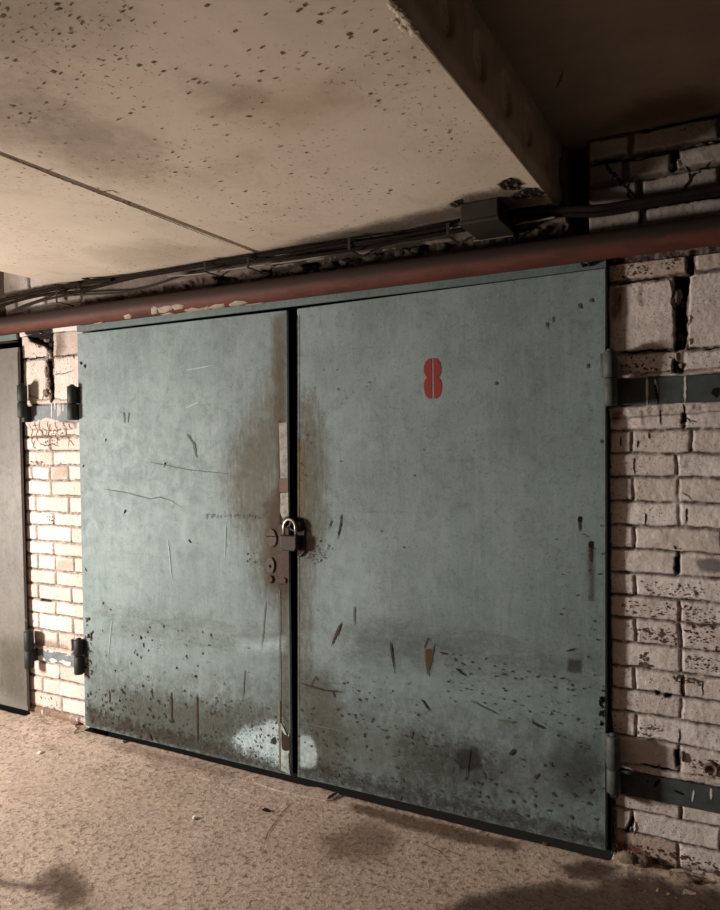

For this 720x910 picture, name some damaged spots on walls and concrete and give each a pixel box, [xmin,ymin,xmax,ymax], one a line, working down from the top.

spalling [209,276,239,287]
peeling [146,292,264,315]